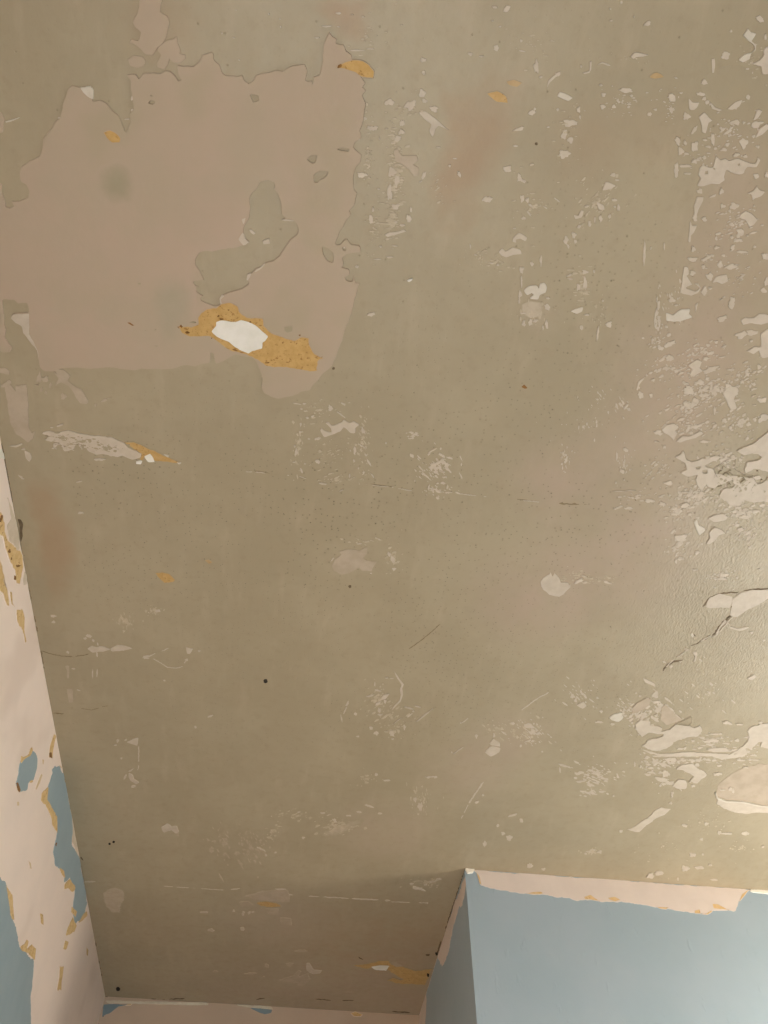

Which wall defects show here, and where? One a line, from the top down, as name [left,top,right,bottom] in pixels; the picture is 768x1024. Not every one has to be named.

peeling [492,5,586,164]
peeling [721,15,768,86]
peeling [0,0,462,499]
peeling [470,163,560,329]
peeling [561,77,768,590]
flaking render [7,497,19,550]
peeling [16,747,37,792]
peeling [41,766,126,950]
peeling [340,673,433,740]
peeling [438,657,768,966]
crack [663,588,768,671]
peeling [0,878,36,1024]